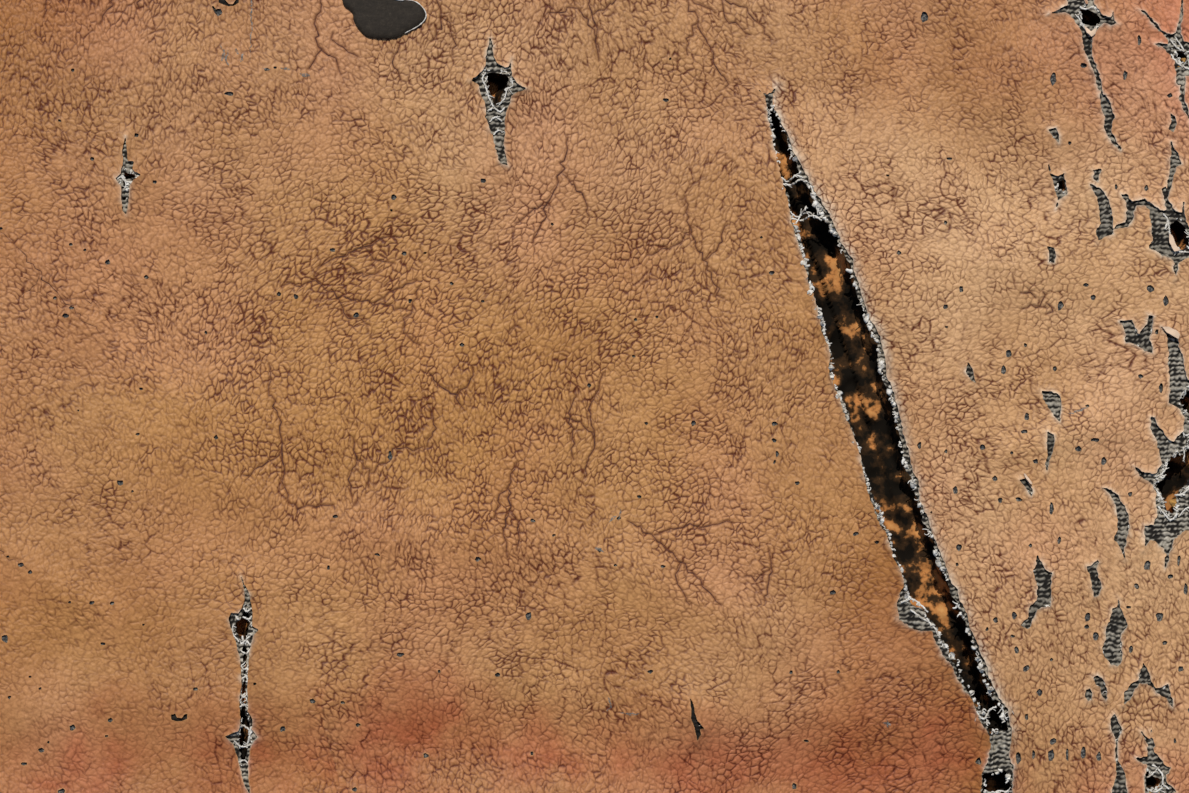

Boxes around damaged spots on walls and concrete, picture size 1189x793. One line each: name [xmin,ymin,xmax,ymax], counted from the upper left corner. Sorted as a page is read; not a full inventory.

peeling [1090,114,1189,274]
peeling [1042,391,1061,421]
peeling [1016,432,1054,501]
peeling [1120,315,1189,578]
peeling [1102,488,1132,558]
peeling [1087,560,1101,597]
peeling [1084,601,1132,666]
peeling [1085,676,1107,701]
peeling [1124,663,1172,706]
spalling [1016,738,1101,764]
peeling [1110,714,1127,793]